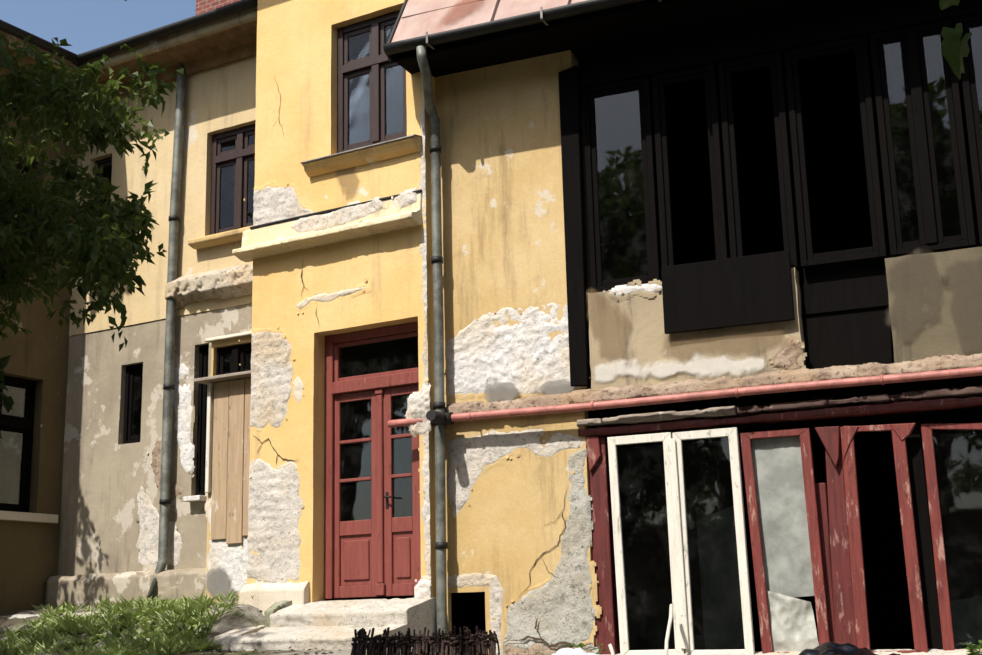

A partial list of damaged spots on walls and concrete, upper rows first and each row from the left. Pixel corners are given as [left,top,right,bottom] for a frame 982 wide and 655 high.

spalling [238,83,432,599]
spalling [444,301,590,401]
peeling [603,279,662,303]
spalling [759,334,807,374]
spalling [135,363,195,567]
crack [253,435,297,462]
spalling [205,459,304,593]
spalling [445,427,602,655]
crack [519,489,567,597]